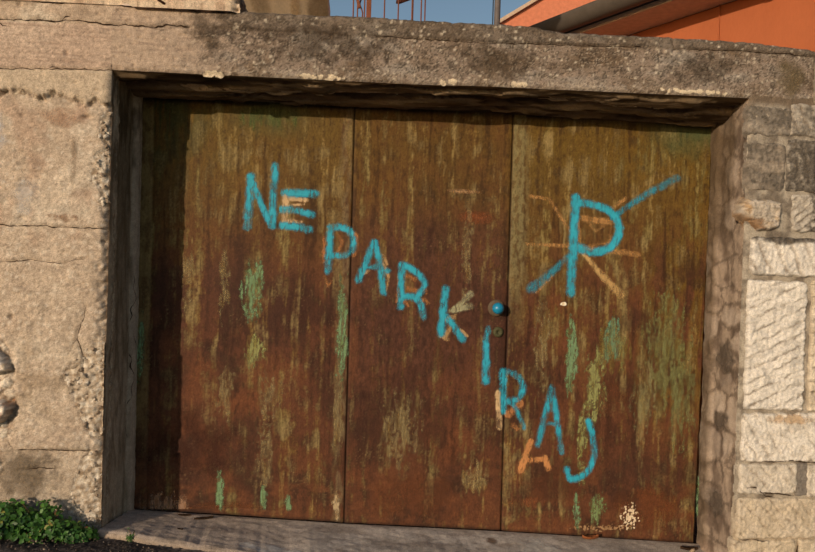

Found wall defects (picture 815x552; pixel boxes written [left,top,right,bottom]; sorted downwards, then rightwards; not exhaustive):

crack [0,1,187,30]